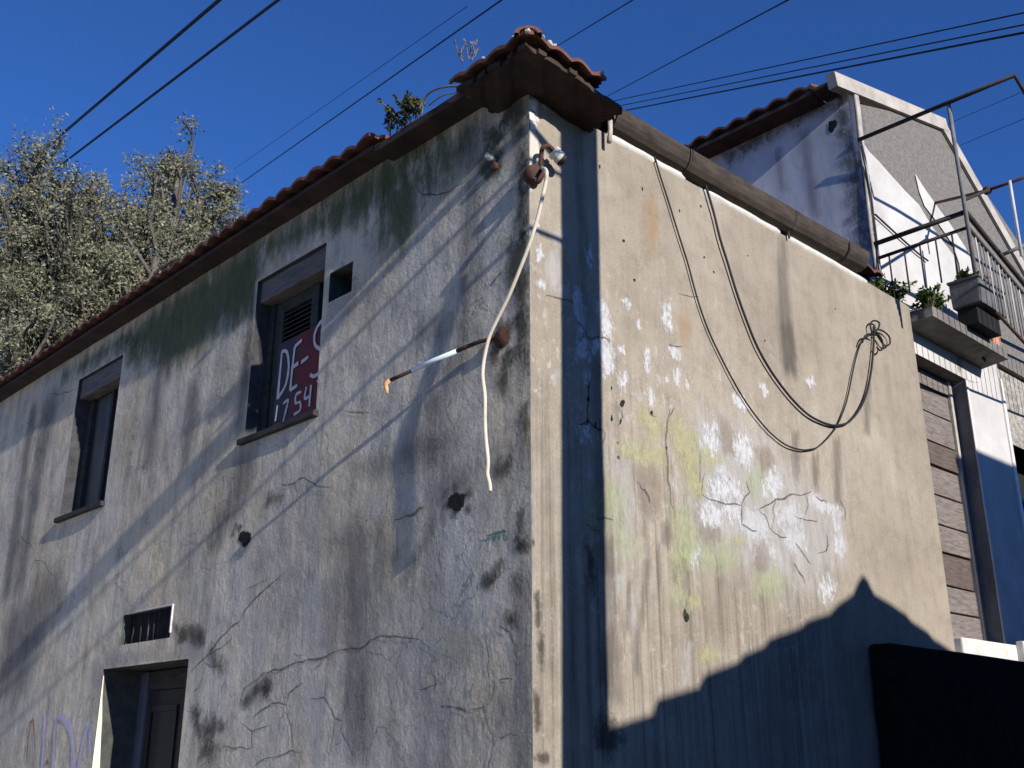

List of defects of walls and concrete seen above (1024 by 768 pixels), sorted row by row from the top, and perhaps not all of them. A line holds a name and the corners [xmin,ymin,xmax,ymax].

leakage [573,287,627,385]
leakage [662,304,672,330]
leakage [665,346,689,388]
flaking render [233,526,251,548]
spalling [446,487,469,516]
leakage [700,423,845,568]
crack [699,474,846,574]
leakage [818,577,836,603]
crack [194,577,279,691]
crack [224,636,427,766]
leakage [193,708,224,758]